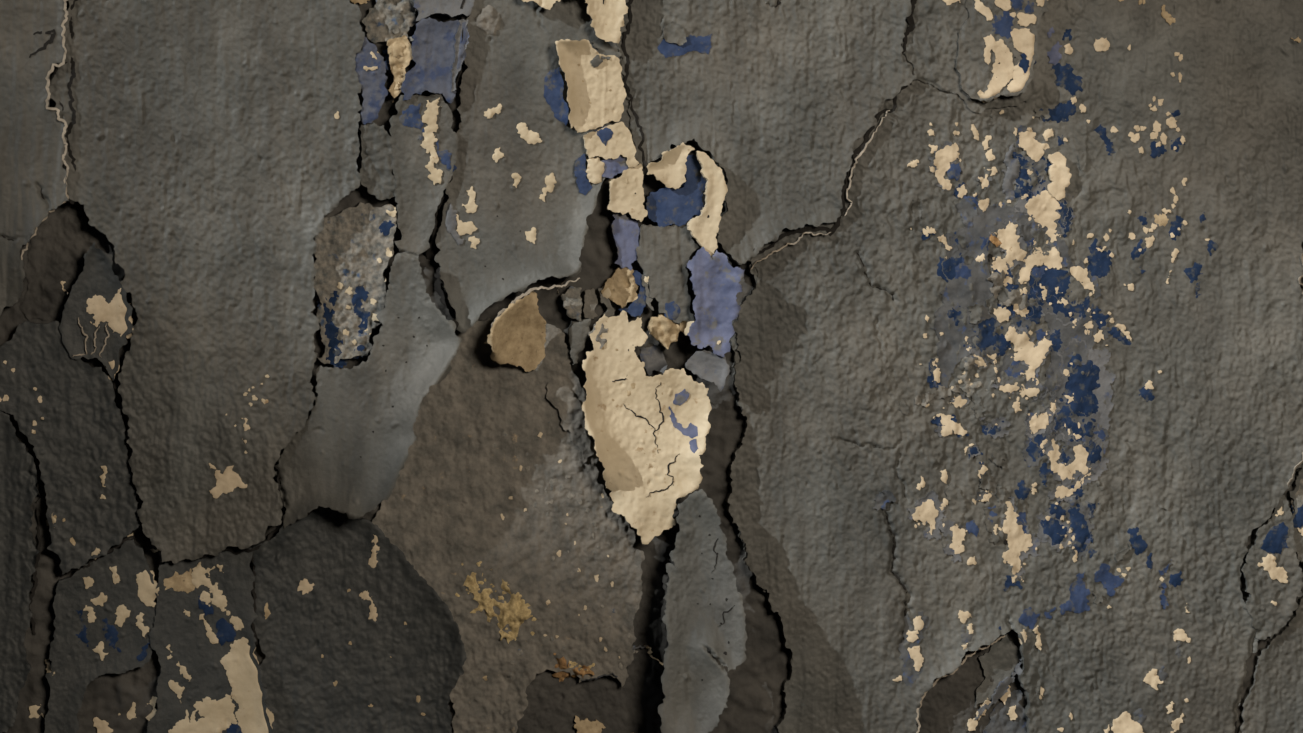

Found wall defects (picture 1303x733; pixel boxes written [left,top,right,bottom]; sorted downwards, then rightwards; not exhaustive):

crack [29,0,78,213]
crack [29,381,313,645]
spalling [314,202,397,368]
peeling [350,0,469,185]
peeling [522,0,561,10]
spalling [368,122,744,733]
peeling [585,0,628,67]
crack [742,0,917,301]
peeling [873,0,1185,733]
peeling [1124,178,1219,298]
peeling [1258,479,1303,583]
peeling [75,548,274,733]